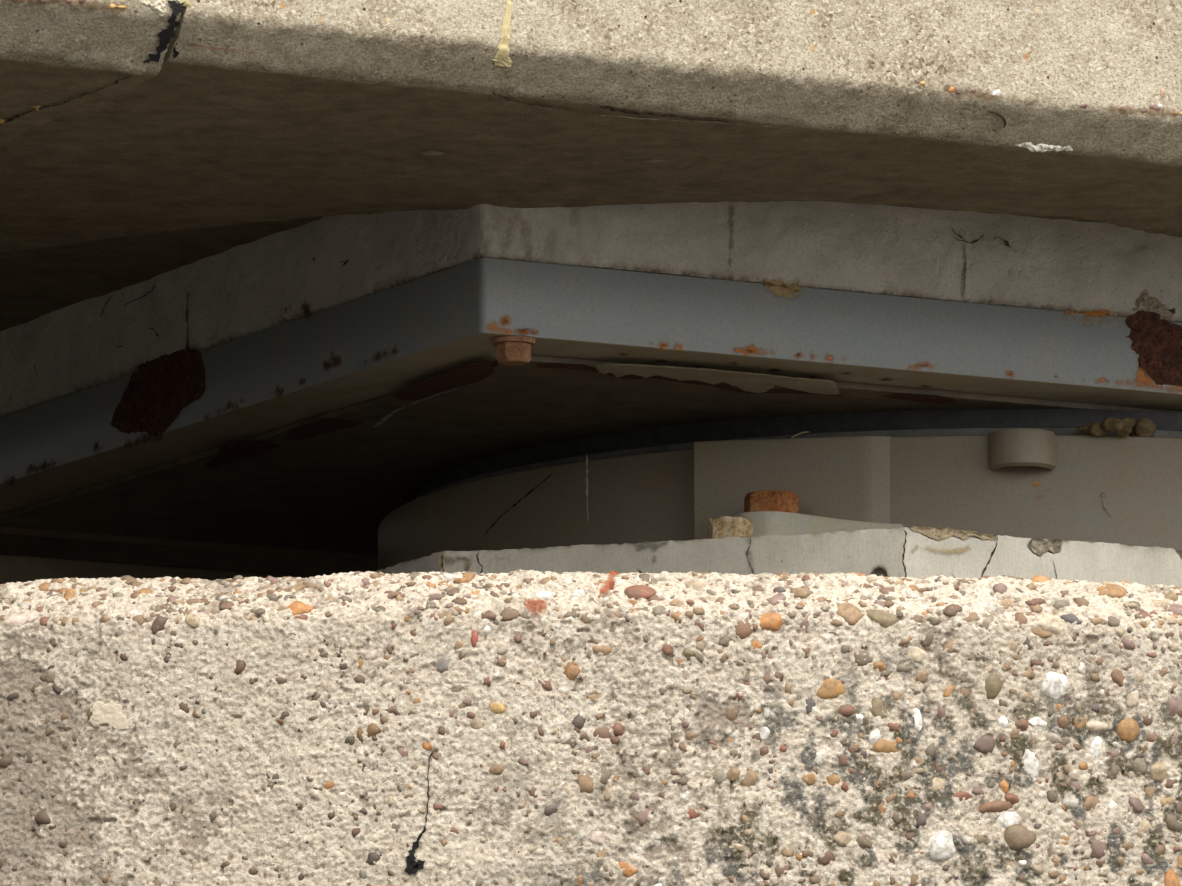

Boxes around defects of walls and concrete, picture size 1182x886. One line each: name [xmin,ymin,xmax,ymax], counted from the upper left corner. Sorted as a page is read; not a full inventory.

spalling [13,0,167,17]
rust [488,317,536,335]
rust [1098,310,1182,391]
rust [111,348,205,448]
crack [733,538,754,574]
crack [951,537,998,578]